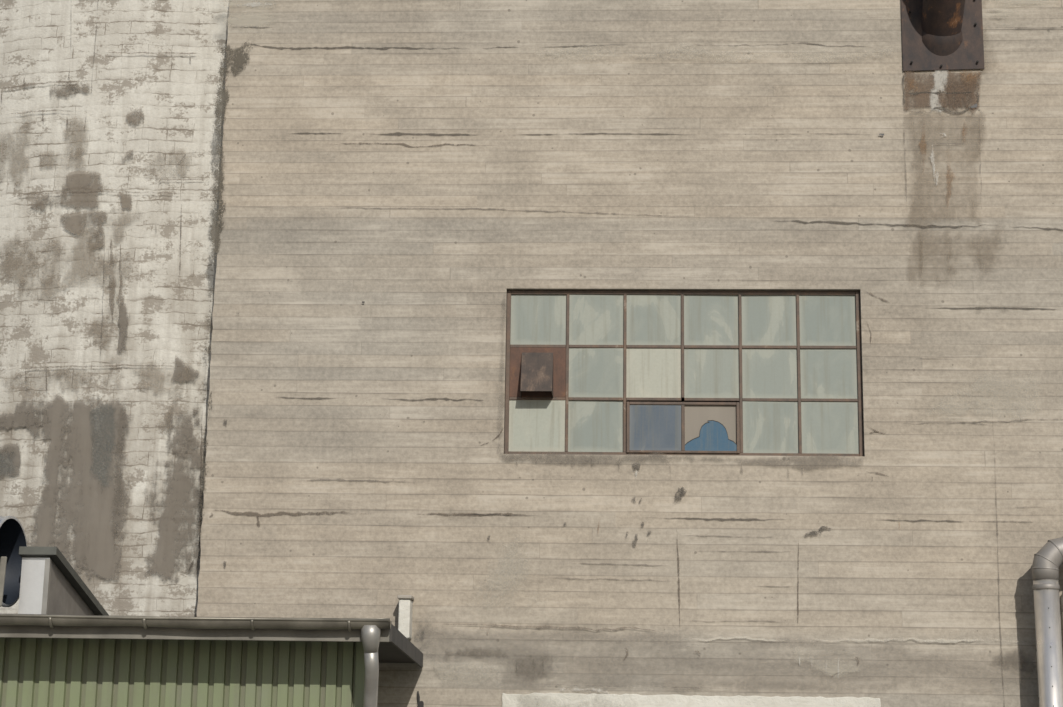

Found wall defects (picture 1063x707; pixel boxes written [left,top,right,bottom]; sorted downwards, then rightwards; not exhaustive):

crack [294,132,474,147]
crack [521,130,691,138]
damp [108,215,129,340]
crack [189,441,343,570]
crack [429,510,521,518]